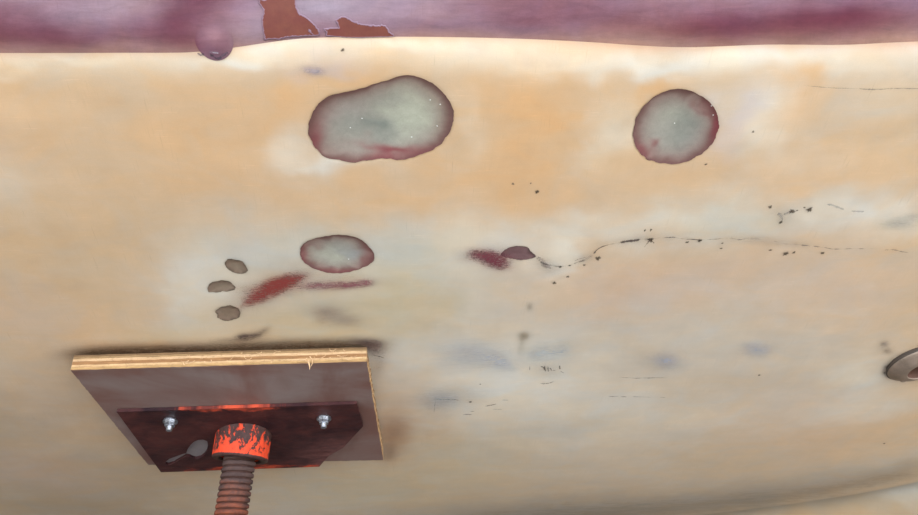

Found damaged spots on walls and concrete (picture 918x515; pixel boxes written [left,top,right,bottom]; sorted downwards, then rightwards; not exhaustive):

peeling [258,0,394,41]
crack [538,229,740,284]